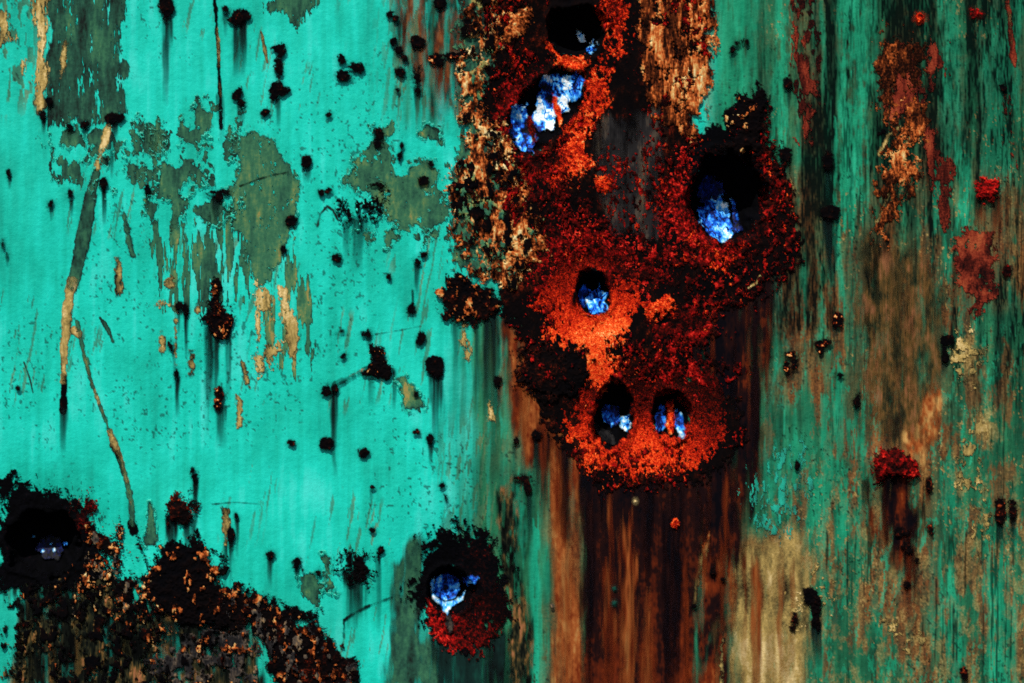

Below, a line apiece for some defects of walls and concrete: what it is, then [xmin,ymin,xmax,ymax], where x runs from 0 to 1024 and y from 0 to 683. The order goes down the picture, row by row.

peeling [0,9,18,47]
rust [38,96,53,127]
rust [99,177,108,211]
rust [104,112,125,140]
peeling [21,0,320,428]
peeling [340,0,506,283]
rust [167,276,235,428]
rust [360,328,395,386]
rust [386,0,823,683]
rust [814,12,955,589]
rust [0,466,360,683]
rust [291,545,385,612]